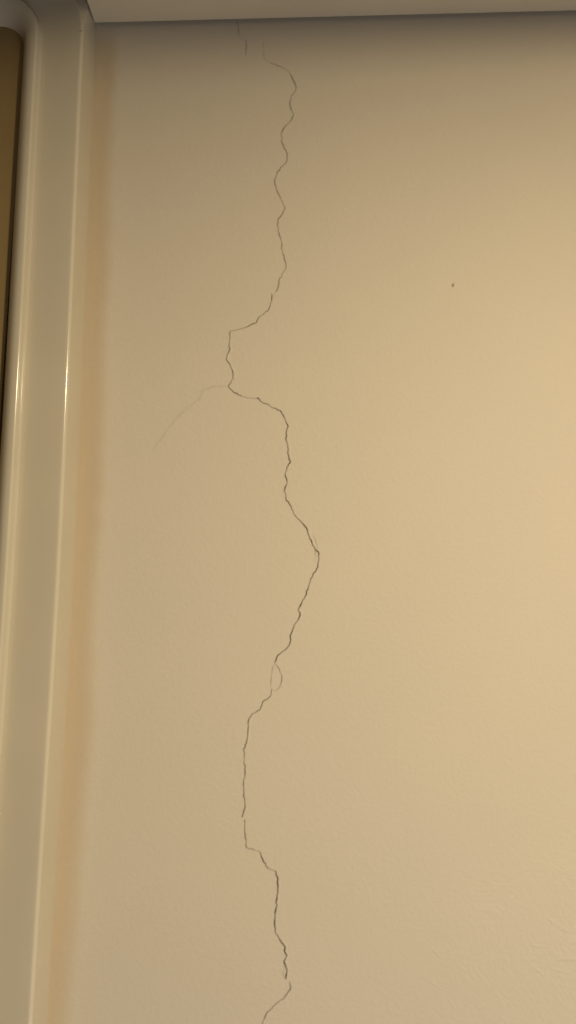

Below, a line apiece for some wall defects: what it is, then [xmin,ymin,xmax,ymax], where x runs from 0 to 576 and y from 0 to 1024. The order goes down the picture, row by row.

crack [281,412,293,502]
crack [276,524,319,659]
crack [262,858,290,979]